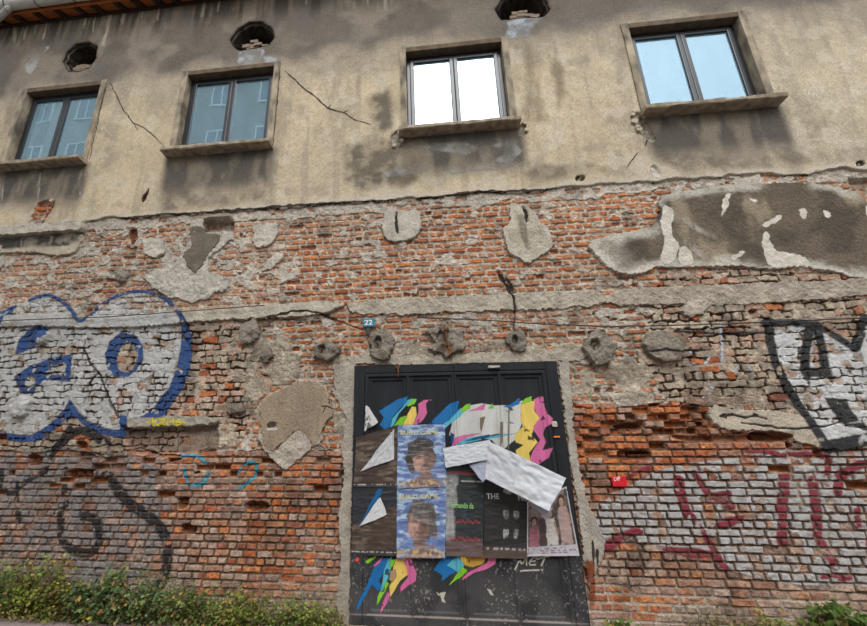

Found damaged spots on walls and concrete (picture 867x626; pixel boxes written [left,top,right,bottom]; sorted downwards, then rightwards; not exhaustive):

hole [495,0,550,20]
hole [230,22,274,51]
damp [507,17,543,39]
efflorescence [237,49,277,65]
crack [89,83,163,159]
crack [273,71,370,144]
peeling [721,193,731,216]
peeling [660,205,694,266]
peeling [762,215,812,271]
crack [497,272,516,314]
crack [262,310,363,330]
crack [719,413,841,430]